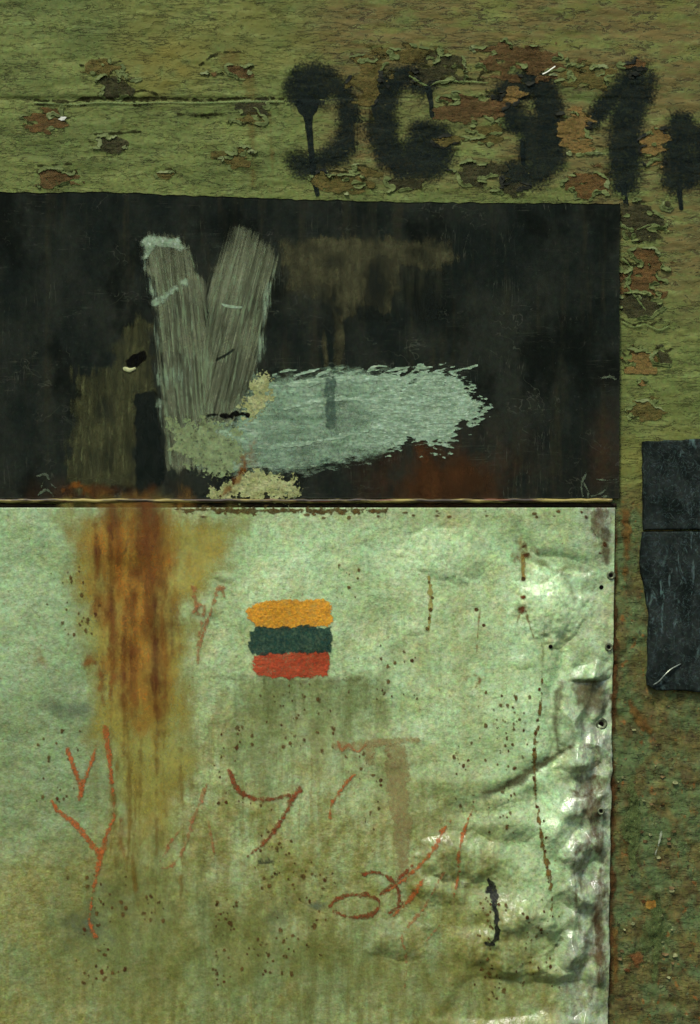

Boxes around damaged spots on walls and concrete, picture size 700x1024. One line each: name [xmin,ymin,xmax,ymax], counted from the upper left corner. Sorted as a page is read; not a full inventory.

peeling [19,105,75,135]
peeling [88,133,129,154]
peeling [76,57,143,102]
peeling [227,97,279,127]
peeling [307,163,425,195]
peeling [345,37,654,198]
peeling [619,344,672,422]
rust [61,482,388,838]
rust [452,679,563,1001]
rust [254,831,337,930]
rust [78,874,128,985]
rust [246,917,322,976]